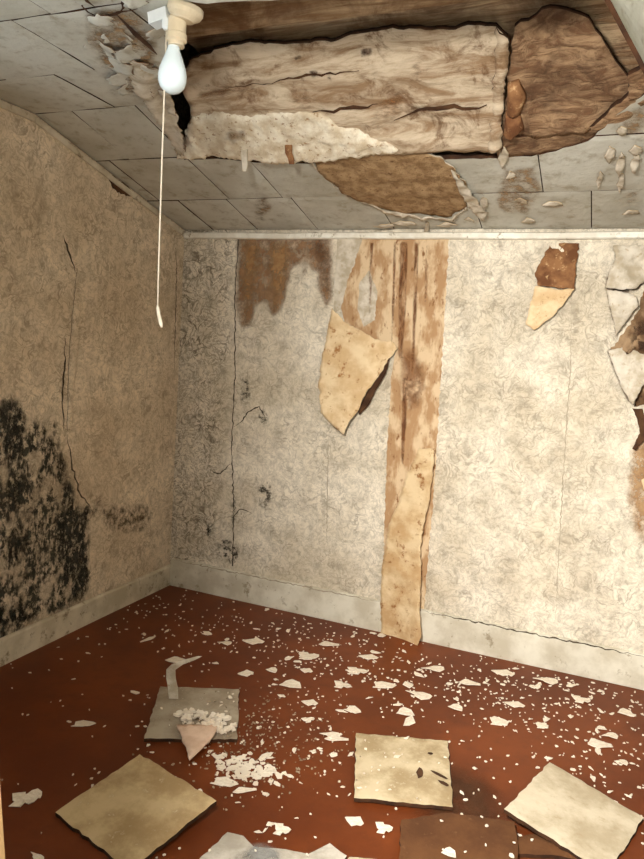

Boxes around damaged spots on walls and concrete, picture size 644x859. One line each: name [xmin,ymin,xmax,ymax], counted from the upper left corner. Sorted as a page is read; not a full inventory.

peeling [73,0,159,99]
peeling [146,28,166,40]
peeling [497,147,515,183]
peeling [604,145,643,193]
crack [63,235,75,270]
peeling [606,245,644,407]
crack [61,338,93,512]
water stain [0,400,90,638]
water stain [631,442,644,532]